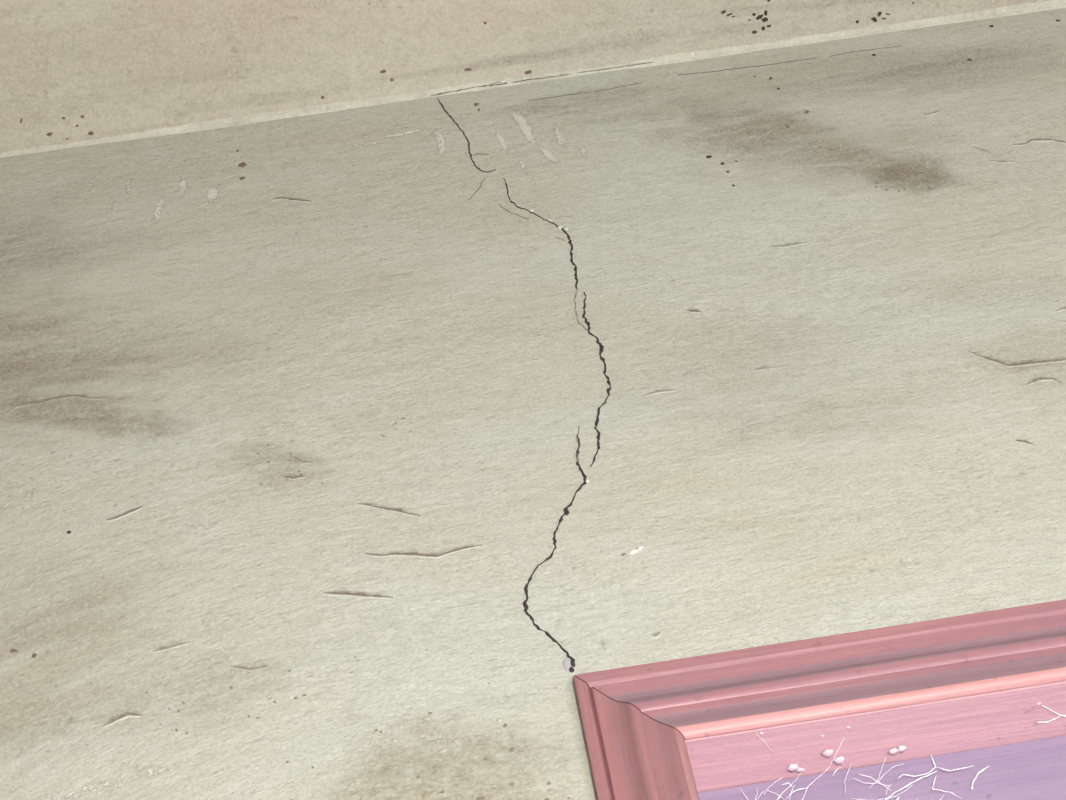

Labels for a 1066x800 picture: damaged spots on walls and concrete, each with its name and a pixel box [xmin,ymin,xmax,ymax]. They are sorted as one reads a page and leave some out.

crack [431,59,653,673]
crack [679,45,902,75]